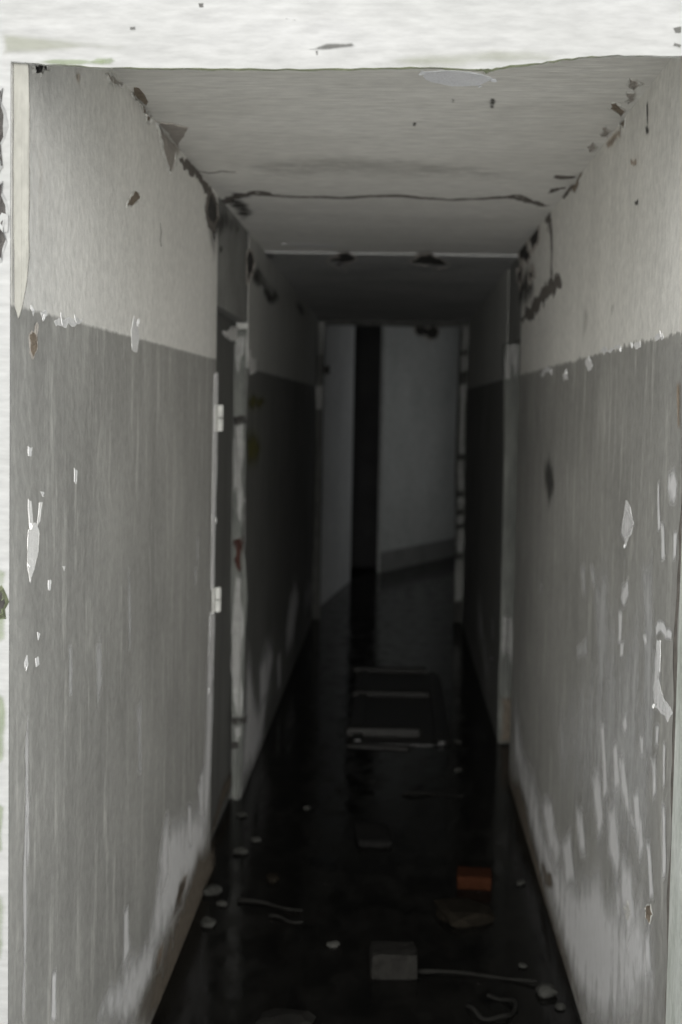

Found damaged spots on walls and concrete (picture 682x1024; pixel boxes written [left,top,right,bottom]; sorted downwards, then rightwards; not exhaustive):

spalling [104,72,188,176]
spalling [586,77,645,152]
spalling [205,186,219,233]
crack [179,157,576,323]
peeling [29,305,83,359]
peeling [585,341,641,371]
peeling [27,491,44,582]
water stain [622,514,632,536]
peeling [622,500,634,549]
peeling [652,640,673,722]
water stain [102,583,298,1020]
water stain [507,577,672,1016]